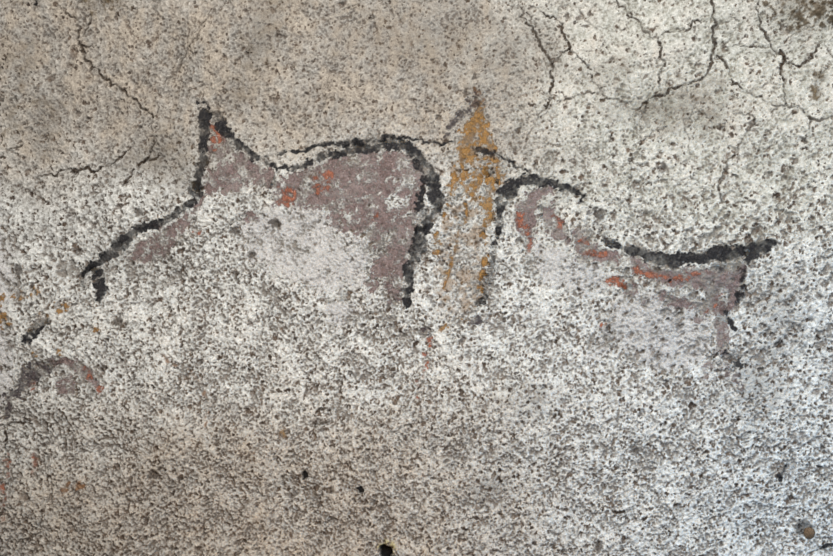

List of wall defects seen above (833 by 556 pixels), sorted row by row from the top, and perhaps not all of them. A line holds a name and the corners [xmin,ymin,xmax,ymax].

crack [55,6,154,118]
crack [518,0,833,201]
crack [41,140,161,185]